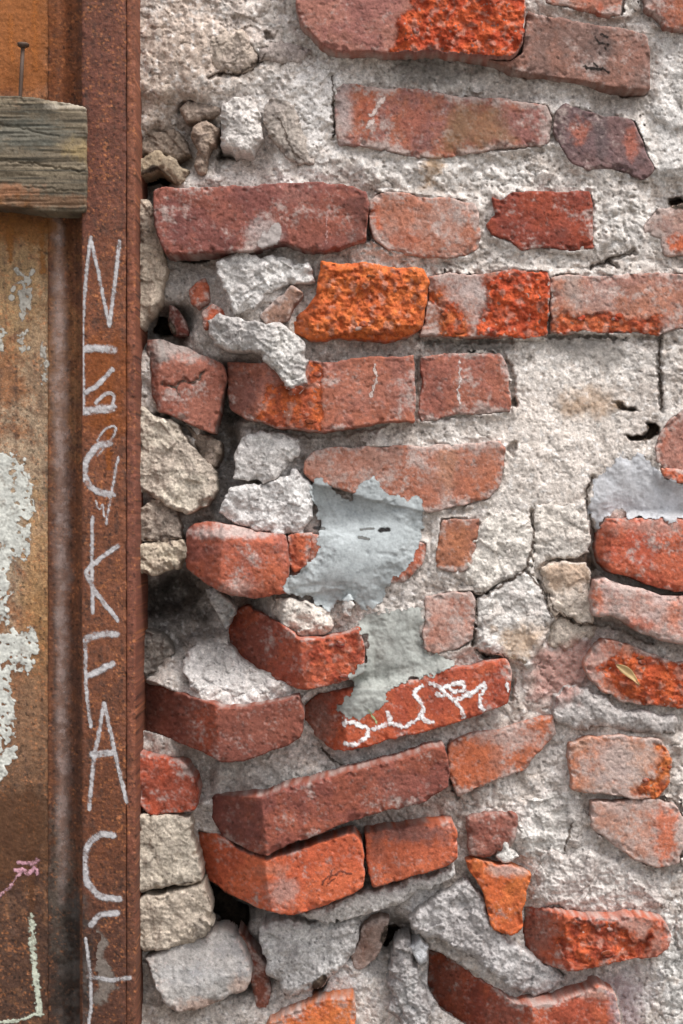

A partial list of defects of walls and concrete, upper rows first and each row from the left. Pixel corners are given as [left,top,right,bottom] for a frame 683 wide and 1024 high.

spalling [256,362,324,431]
crack [471,512,594,664]